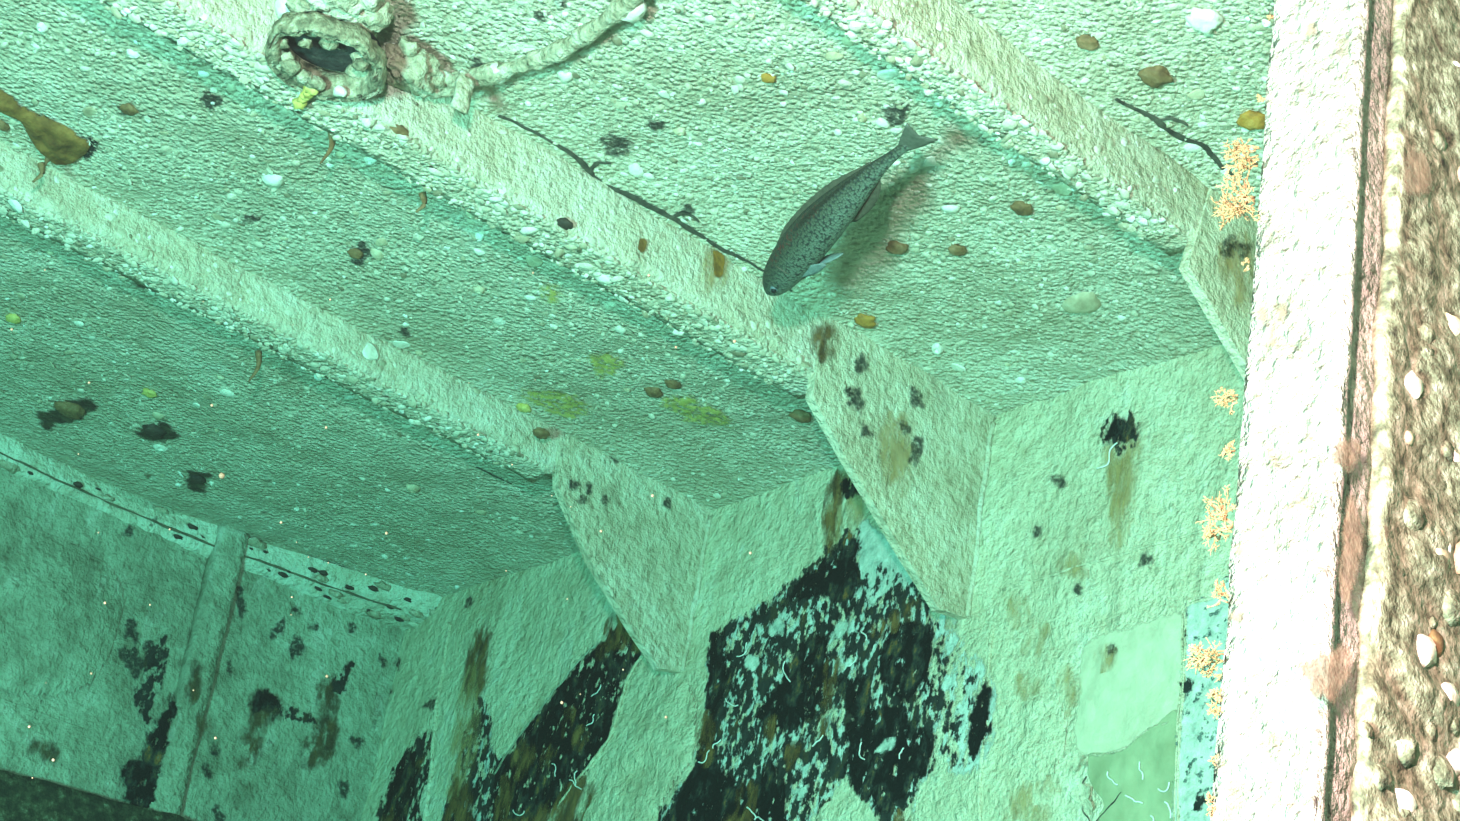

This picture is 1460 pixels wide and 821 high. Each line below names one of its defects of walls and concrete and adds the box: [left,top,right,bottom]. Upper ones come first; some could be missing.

rust [0,89,98,166]
crack [497,115,793,292]
crack [1113,98,1236,178]
rust [1096,410,1139,541]
peeling [1066,577,1229,821]